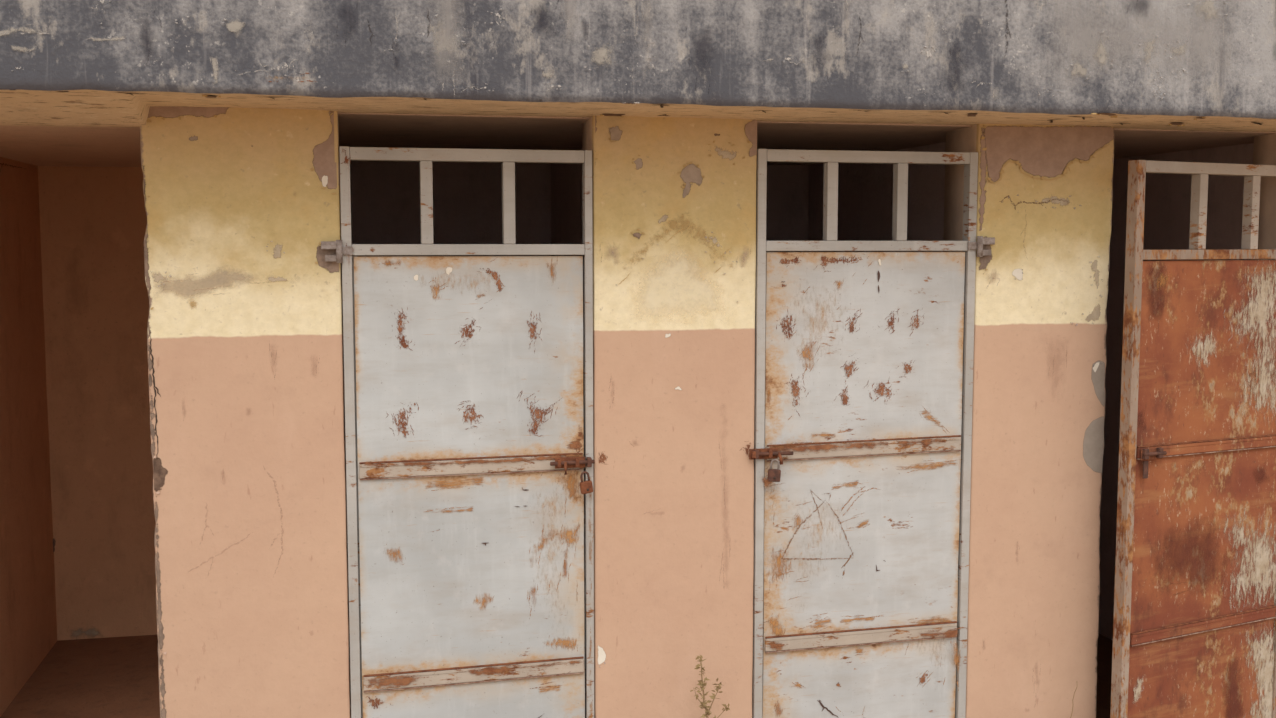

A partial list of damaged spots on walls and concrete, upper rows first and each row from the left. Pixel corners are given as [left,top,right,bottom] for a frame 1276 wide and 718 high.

water stain [0,27,35,51]
peeling [310,111,339,195]
spalling [678,120,757,198]
spalling [967,113,1118,231]
corrosion [397,307,415,351]
corrosion [456,257,504,346]
corrosion [835,353,859,405]
corrosion [387,403,419,436]
corrosion [365,432,608,467]
corrosion [517,391,563,437]
corrosion [770,408,962,473]
corrosion [909,618,965,691]